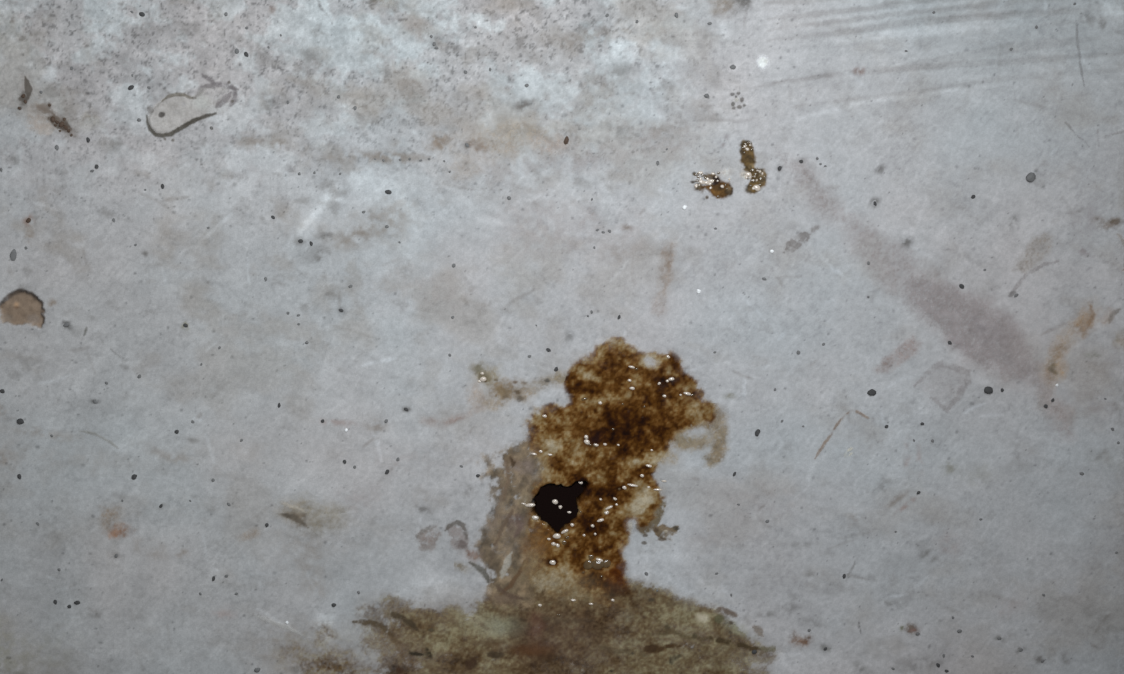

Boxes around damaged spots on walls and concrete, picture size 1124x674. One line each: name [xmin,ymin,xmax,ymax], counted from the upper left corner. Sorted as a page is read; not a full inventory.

spalling [0,289,45,327]
damp [353,337,775,674]
damp [293,648,358,674]